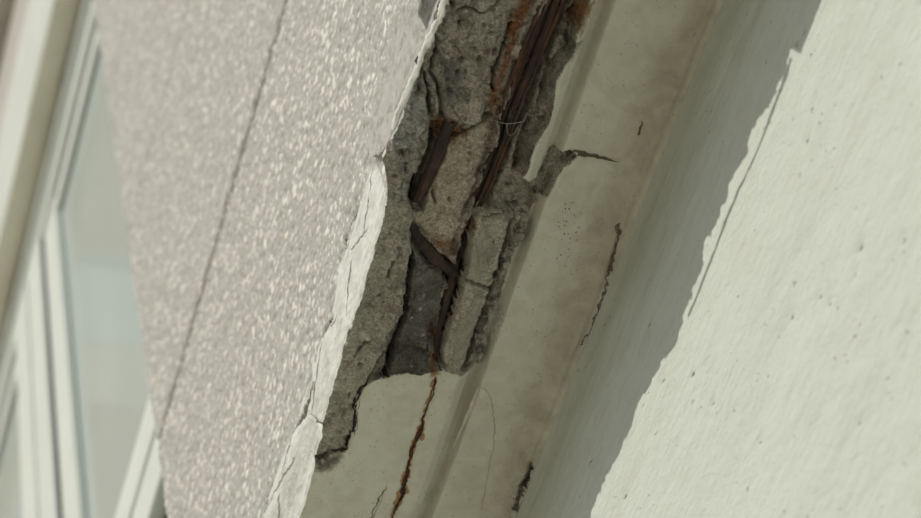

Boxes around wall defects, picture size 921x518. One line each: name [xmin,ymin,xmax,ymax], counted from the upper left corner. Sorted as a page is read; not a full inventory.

corrosion [477,0,533,170]
corrosion [565,0,592,31]
crack [564,150,618,162]
spalling [315,0,591,464]
crack [580,223,622,346]
crack [371,377,437,518]